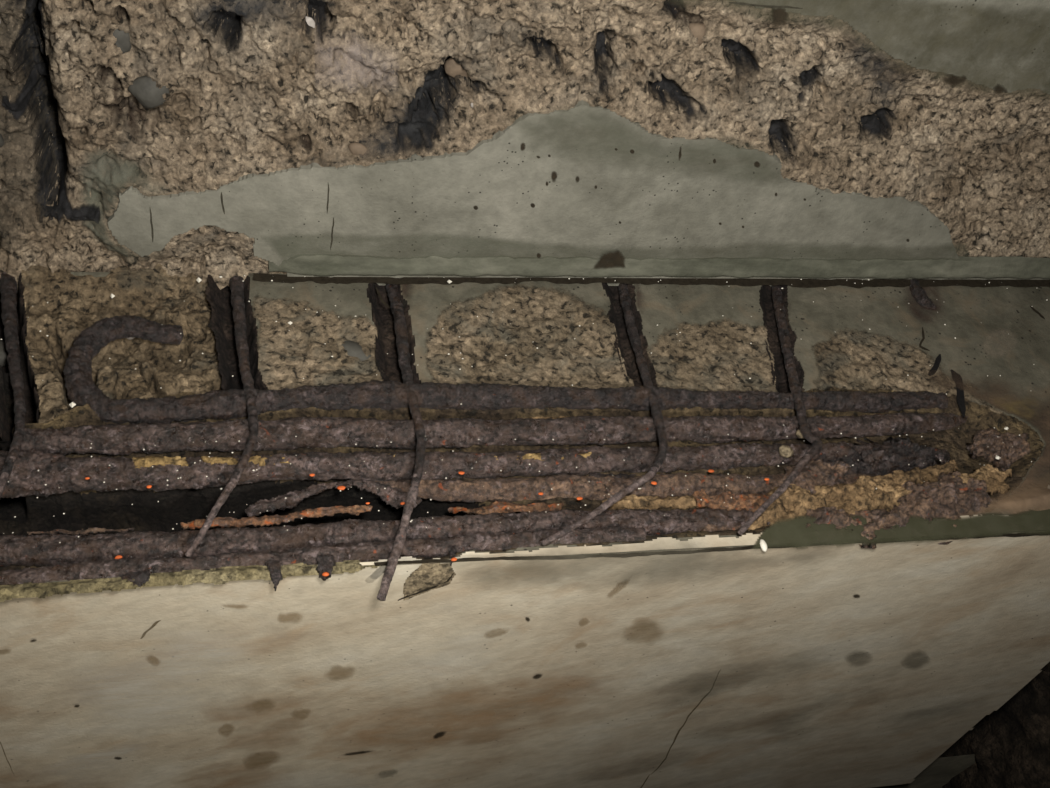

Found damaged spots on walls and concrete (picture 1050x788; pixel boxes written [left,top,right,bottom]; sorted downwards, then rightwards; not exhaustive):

spalling [0,0,1050,451]
corrosion [595,251,625,268]
spalling [64,331,1044,514]
spalling [0,479,493,536]
corrosion [746,427,1031,549]
spalling [534,526,770,547]
corrosion [119,571,150,587]
spalling [0,563,319,602]
corrosion [265,560,283,591]
corrosion [316,555,336,581]
spalling [398,548,517,601]
crack [640,669,721,788]